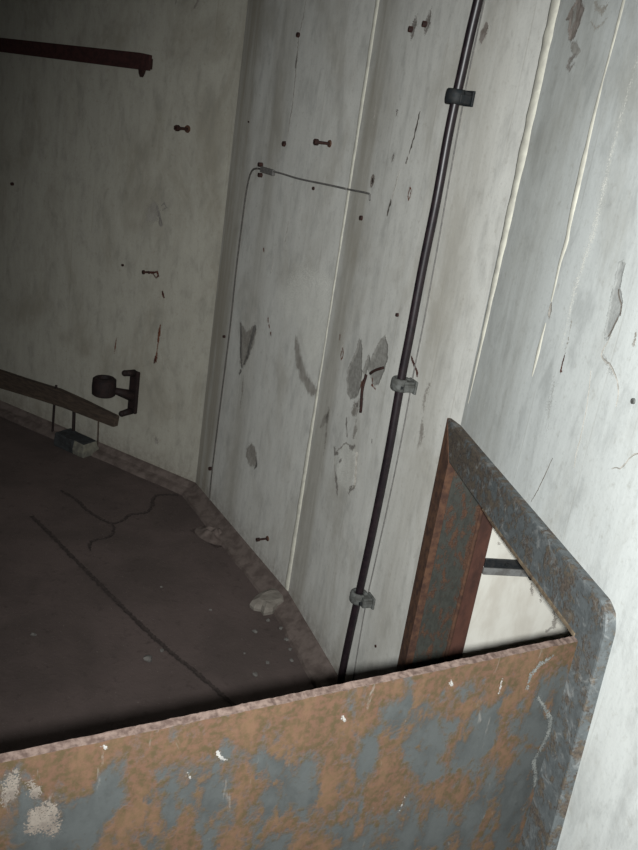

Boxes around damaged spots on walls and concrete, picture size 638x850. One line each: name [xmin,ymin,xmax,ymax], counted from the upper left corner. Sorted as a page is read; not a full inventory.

spalling [566,0,585,72]
spalling [239,323,256,404]
spalling [346,336,388,417]
spalling [601,260,626,406]
spalling [246,443,257,469]
crack [59,490,178,551]
corrosion [482,509,575,636]